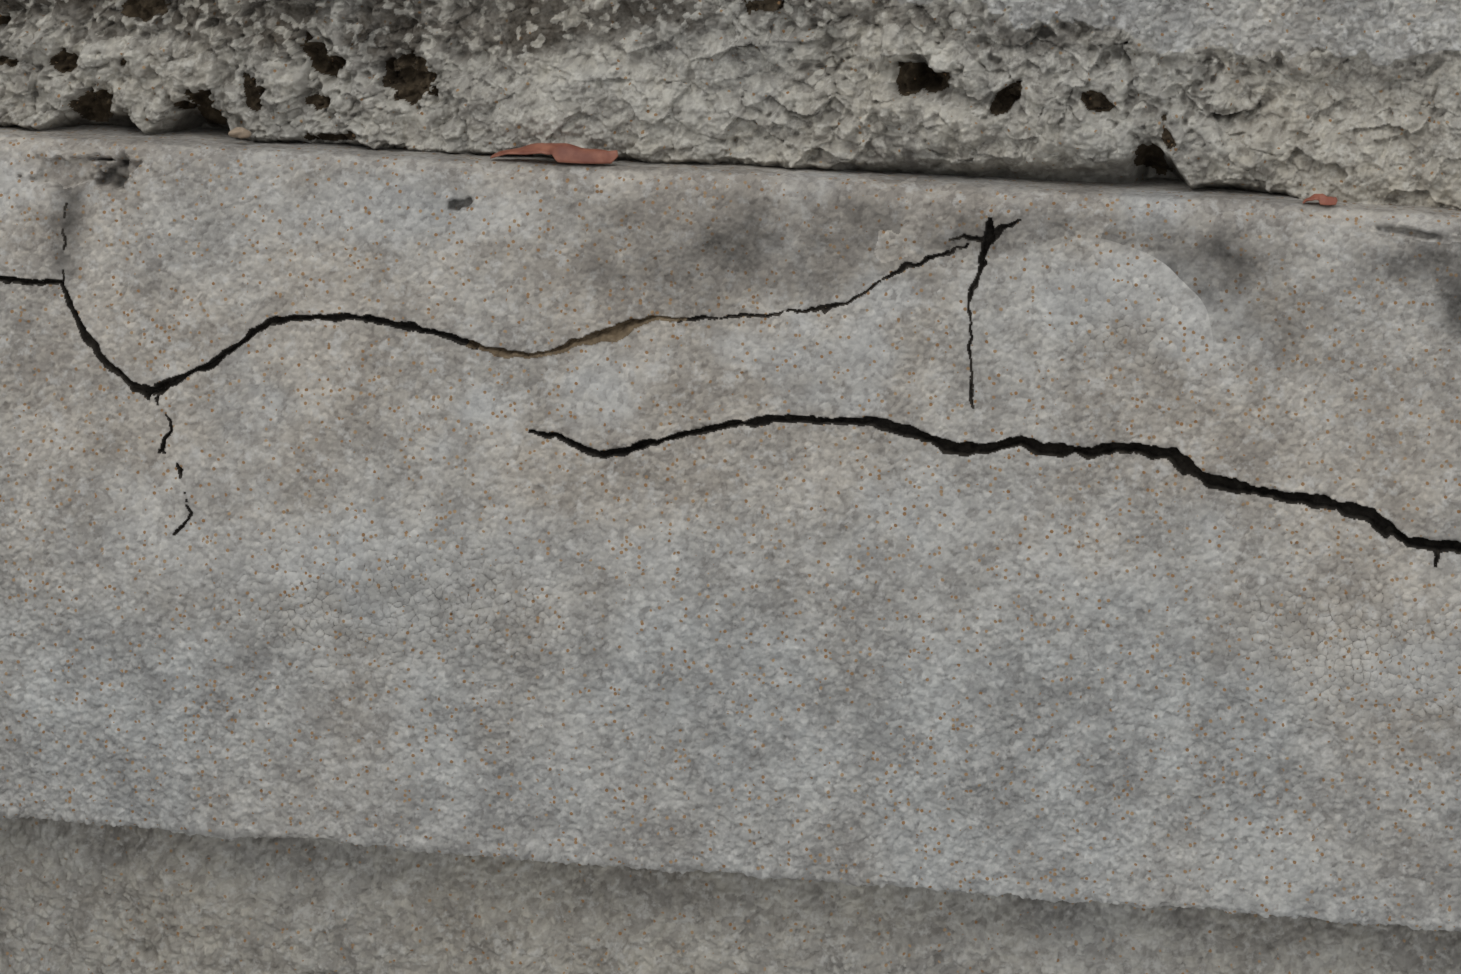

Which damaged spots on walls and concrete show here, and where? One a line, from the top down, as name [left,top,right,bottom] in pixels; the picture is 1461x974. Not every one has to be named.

crack [0,203,1461,567]